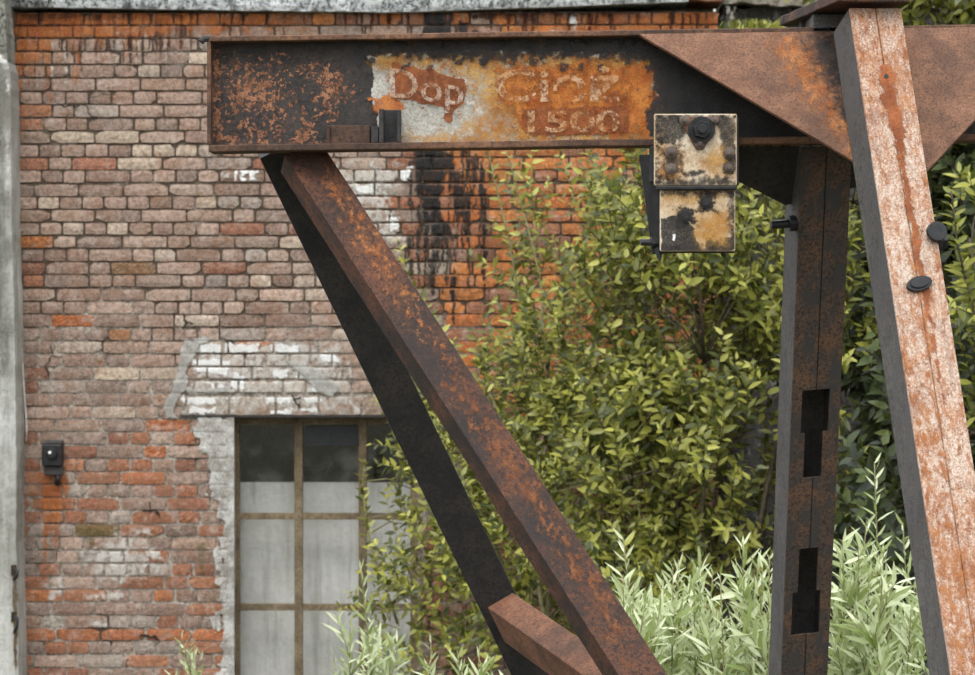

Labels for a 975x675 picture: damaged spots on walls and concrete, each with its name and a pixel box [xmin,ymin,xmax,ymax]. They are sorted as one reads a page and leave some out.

corrosion [15,13,659,150]
peeling [368,50,659,142]
corrosion [766,34,851,157]
corrosion [880,64,913,209]
corrosion [322,168,392,278]
leakage [337,151,493,325]
corrosion [696,210,731,247]
flaking render [144,342,360,675]
corrosion [441,366,636,669]
corrosion [910,372,975,665]